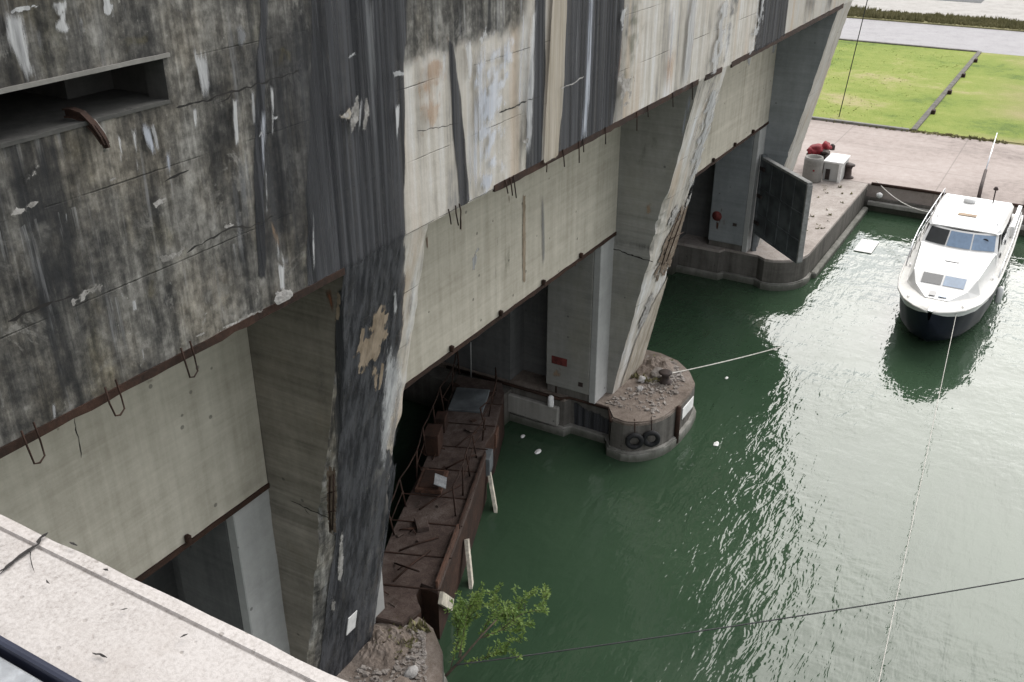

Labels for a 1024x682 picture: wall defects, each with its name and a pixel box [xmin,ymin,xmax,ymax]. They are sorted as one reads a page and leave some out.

leakage [7,5,37,75]
leakage [195,53,209,90]
crack [176,70,299,108]
peeling [341,95,369,133]
crack [499,77,583,113]
leakage [243,0,318,278]
crack [187,216,273,253]
spalling [639,193,692,328]
peeling [71,284,103,306]
leakage [274,265,293,305]
peeling [353,305,389,391]
crack [0,532,48,574]